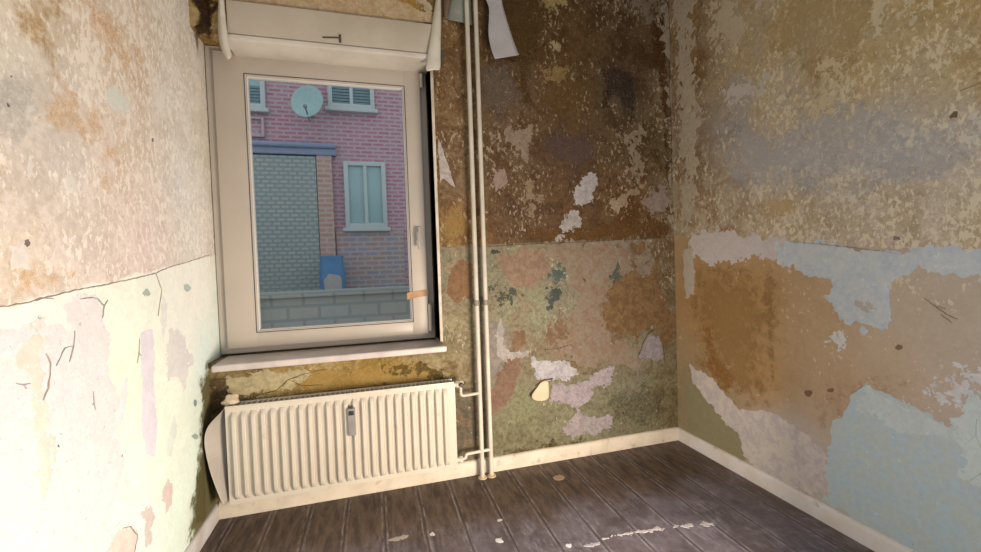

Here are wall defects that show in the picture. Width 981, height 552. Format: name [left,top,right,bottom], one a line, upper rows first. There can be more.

water stain [192,0,218,47]
peeling [537,40,574,90]
peeling [438,139,455,187]
peeling [490,116,548,224]
spalling [605,0,789,299]
flaking render [446,258,474,304]
flaking render [481,172,677,440]
peeling [0,293,173,552]
peeling [140,328,194,457]
water stain [188,371,231,542]
peeling [226,367,312,400]
spalling [689,364,830,498]